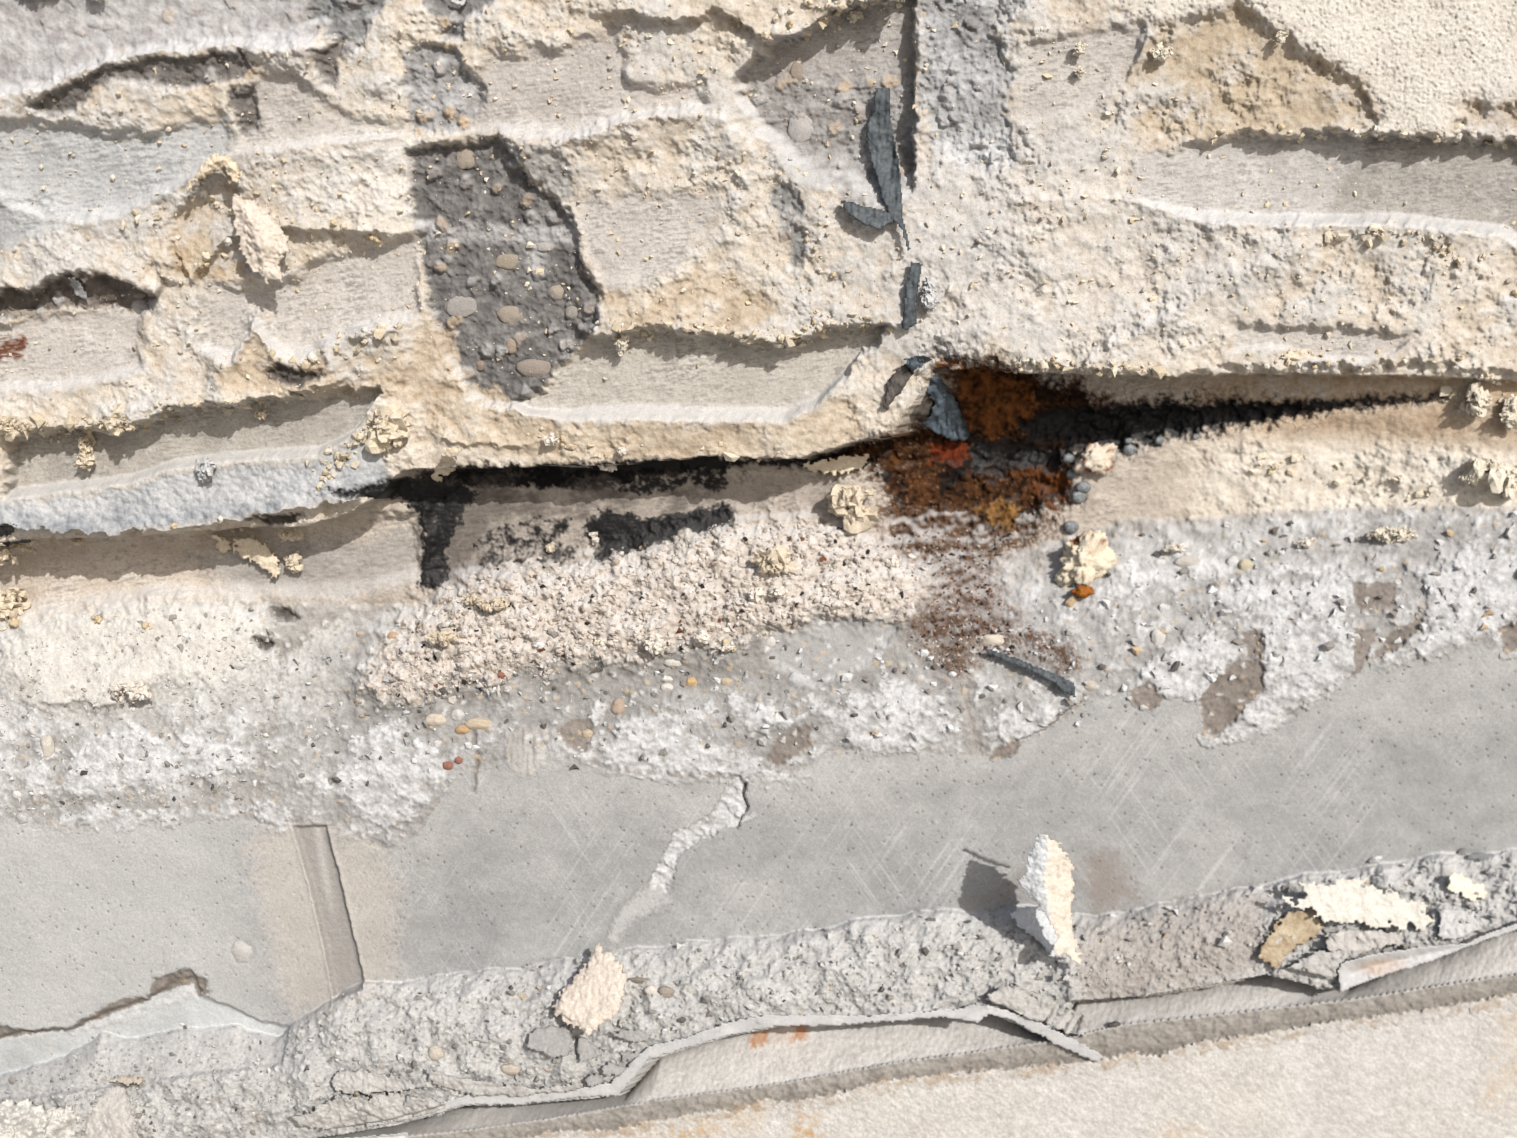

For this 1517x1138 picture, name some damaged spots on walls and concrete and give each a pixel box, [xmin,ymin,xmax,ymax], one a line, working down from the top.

spalling [0,0,1517,518]
spalling [0,504,1517,848]
corrosion [811,335,1450,691]
crack [604,776,758,949]
flaking render [1446,872,1487,902]